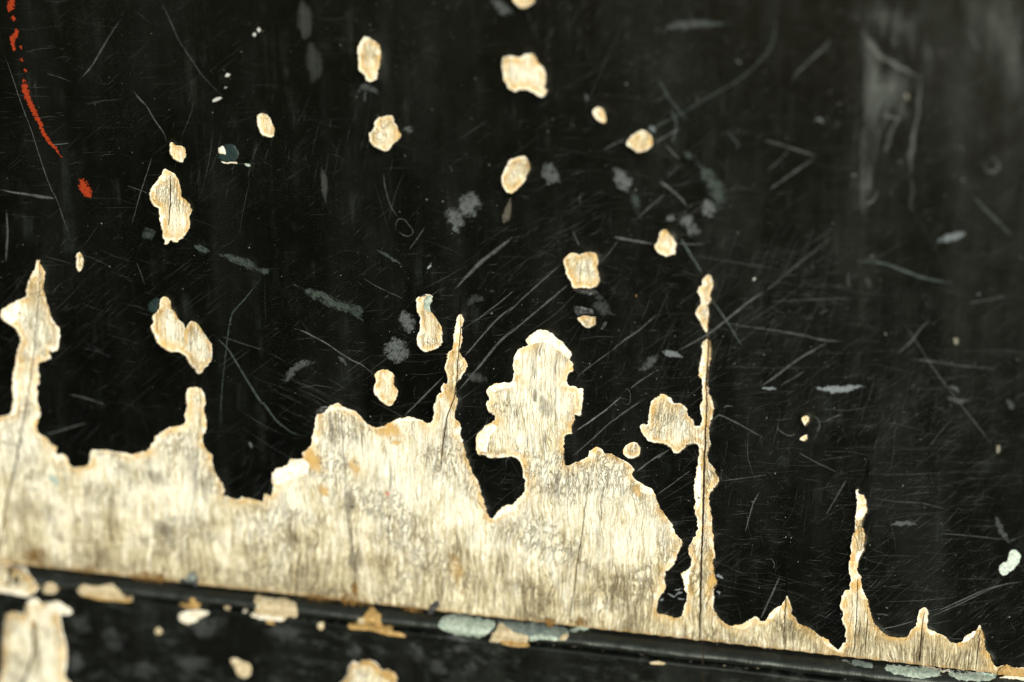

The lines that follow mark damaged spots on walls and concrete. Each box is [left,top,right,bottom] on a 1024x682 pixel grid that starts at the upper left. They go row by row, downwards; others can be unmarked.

peeling [358,37,381,82]
peeling [502,54,547,97]
peeling [257,113,275,137]
peeling [369,116,402,151]
peeling [627,130,653,152]
peeling [150,142,193,244]
peeling [502,156,531,193]
peeling [655,230,677,256]
peeling [0,252,1024,682]